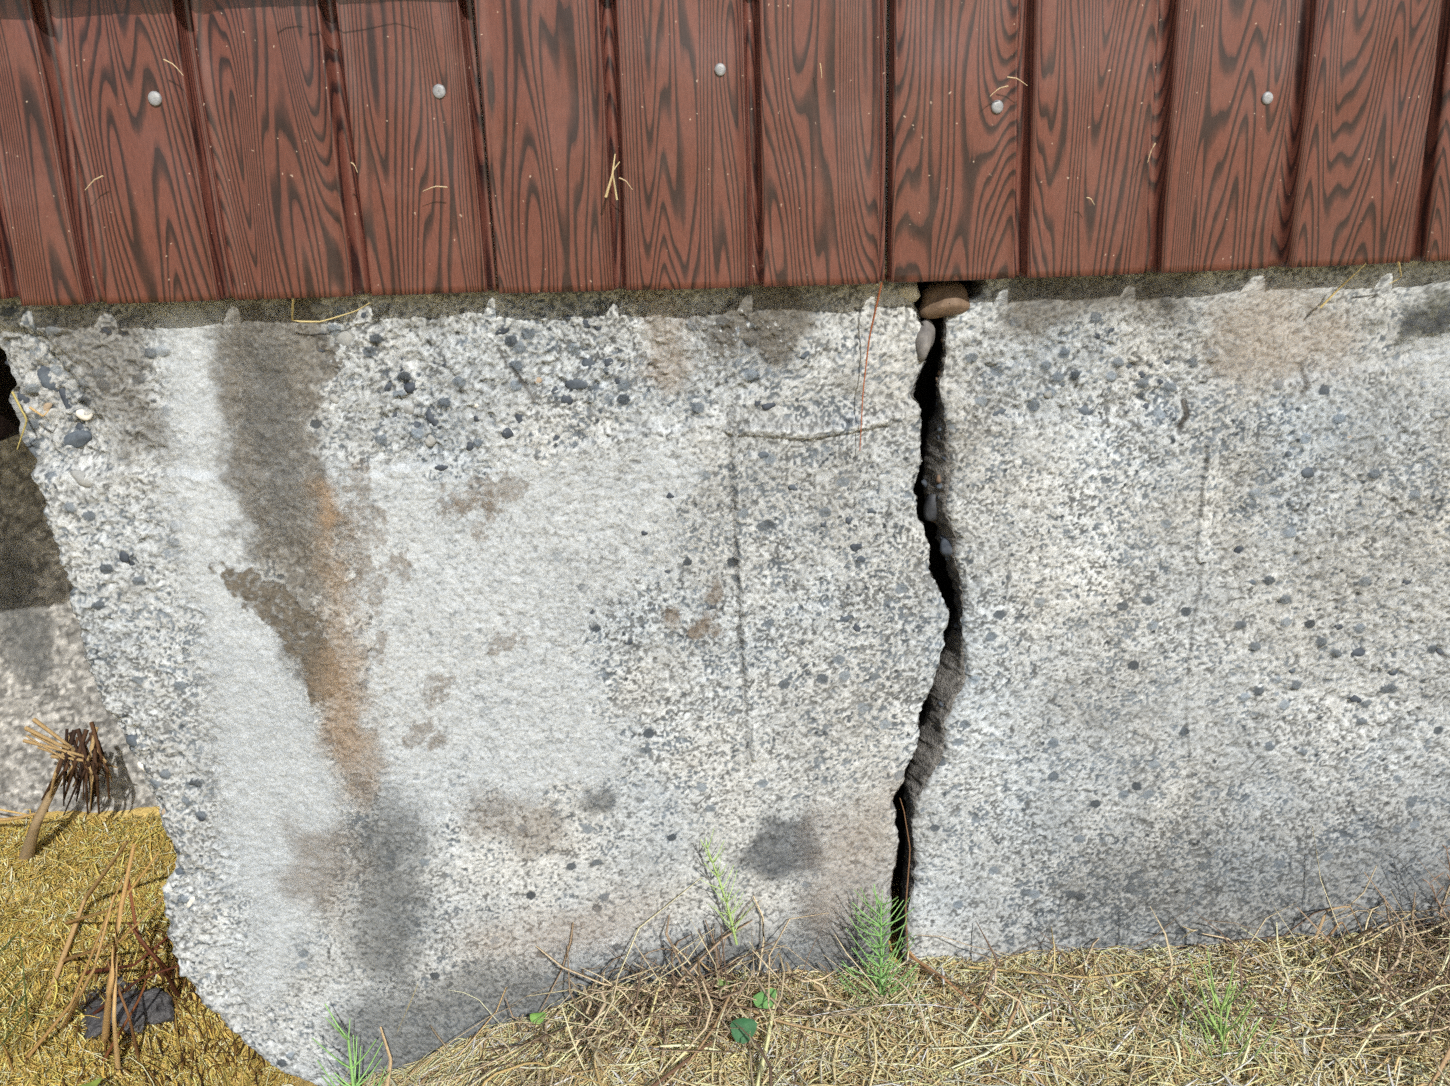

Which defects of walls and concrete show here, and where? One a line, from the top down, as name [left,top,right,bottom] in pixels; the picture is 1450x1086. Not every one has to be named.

damp [161,298,346,998]
damp [746,823,820,876]
crack [888,280,985,963]